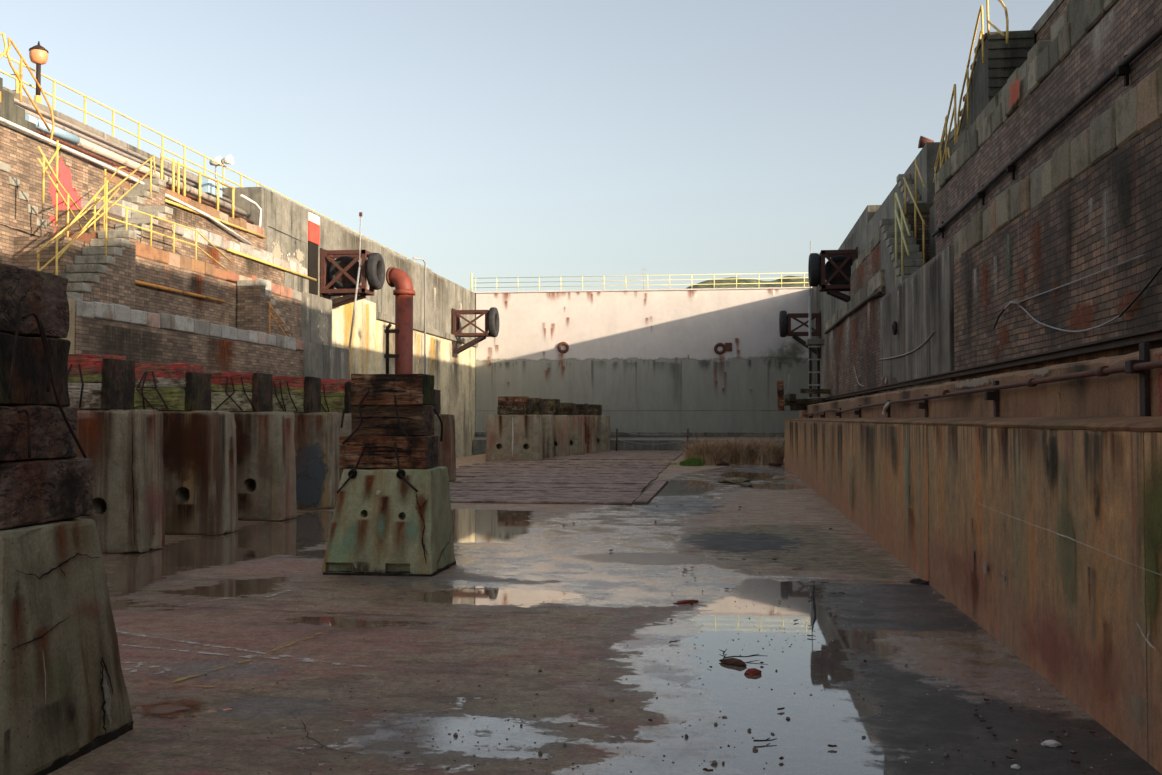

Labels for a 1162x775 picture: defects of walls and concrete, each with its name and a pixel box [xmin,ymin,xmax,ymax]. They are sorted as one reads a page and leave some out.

rust [150,413,206,480]
rust [220,413,267,476]
crack [16,553,100,579]
crack [101,657,113,736]